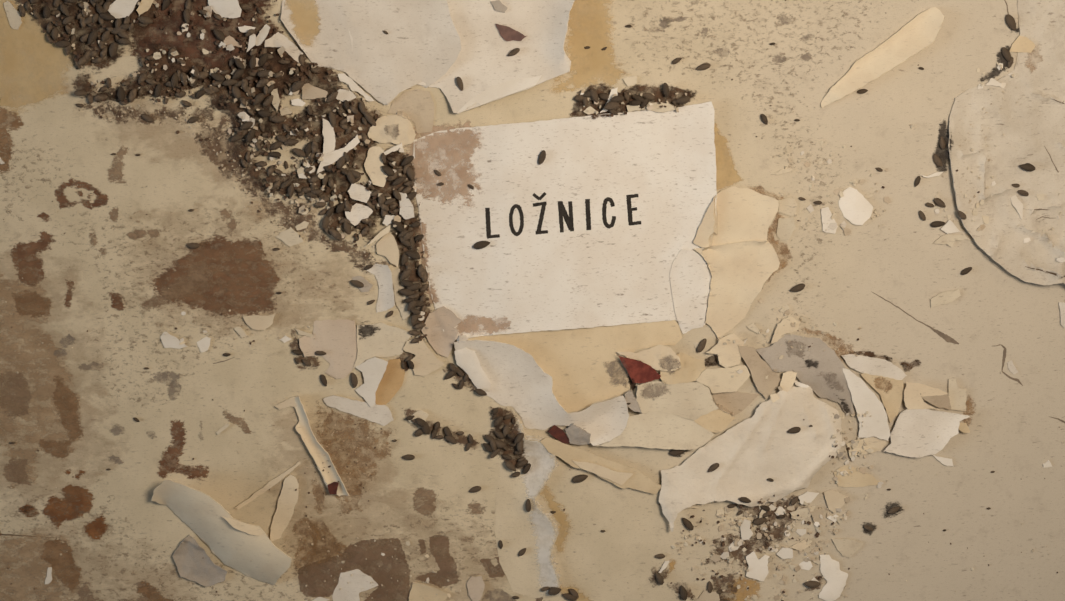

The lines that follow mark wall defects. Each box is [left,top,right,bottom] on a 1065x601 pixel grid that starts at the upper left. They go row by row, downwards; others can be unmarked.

peeling [136,0,154,15]
peeling [0,0,73,115]
peeling [247,0,575,187]
leakage [0,99,24,174]
peeling [922,0,1065,285]
leakage [55,178,109,209]
leakage [109,293,124,310]
leakage [142,234,280,317]
leakage [0,212,83,488]
peeling [279,179,954,601]
leakage [157,420,209,480]
leakage [0,532,103,601]